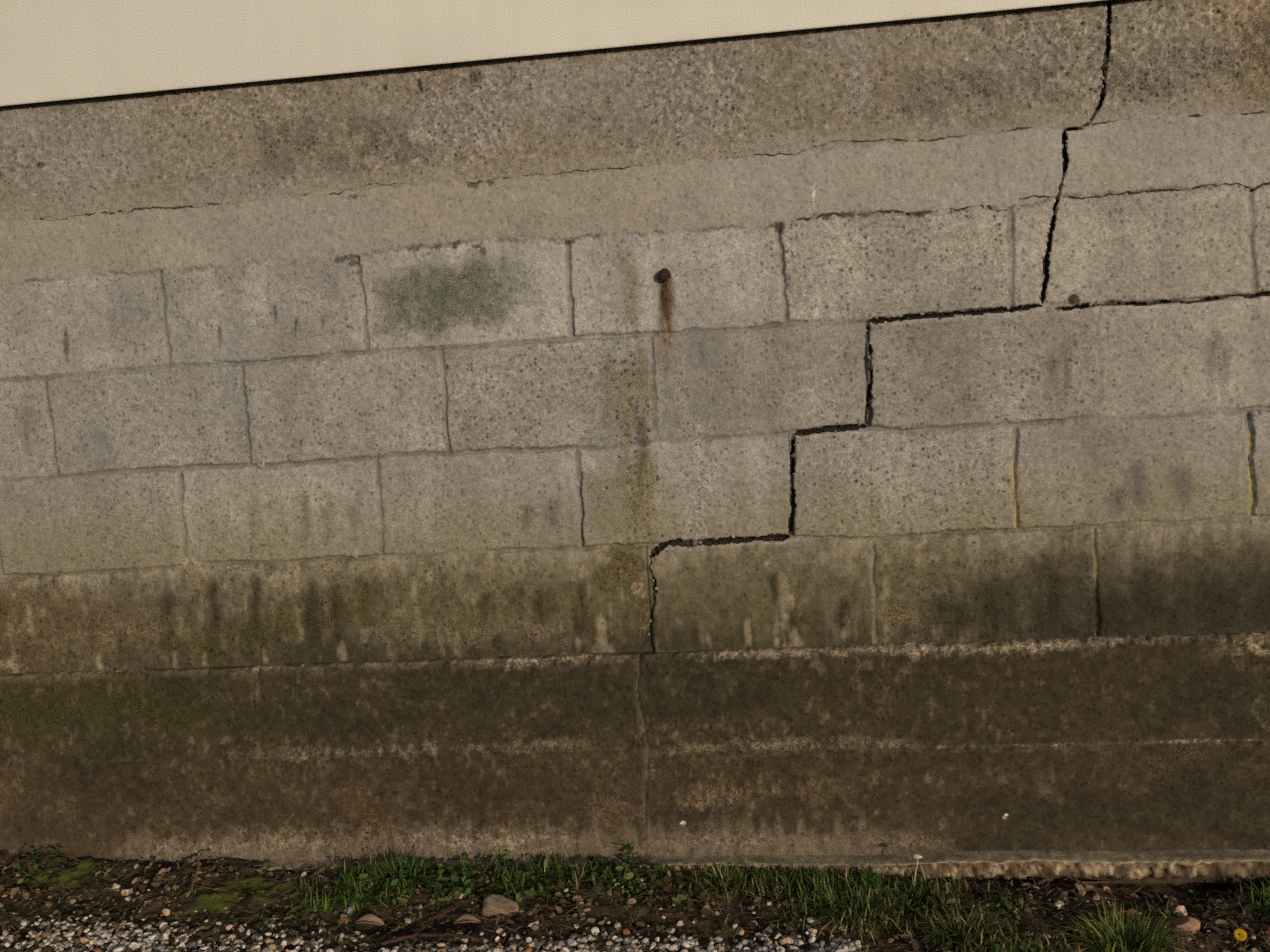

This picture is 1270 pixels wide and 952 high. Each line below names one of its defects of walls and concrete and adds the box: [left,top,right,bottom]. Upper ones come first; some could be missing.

crack [469,164,662,184]
corrosion [661,278,673,357]
crack [640,0,1270,651]
damp [703,614,1122,658]
damp [1223,631,1270,654]
damp [449,653,602,668]
damp [146,828,572,863]